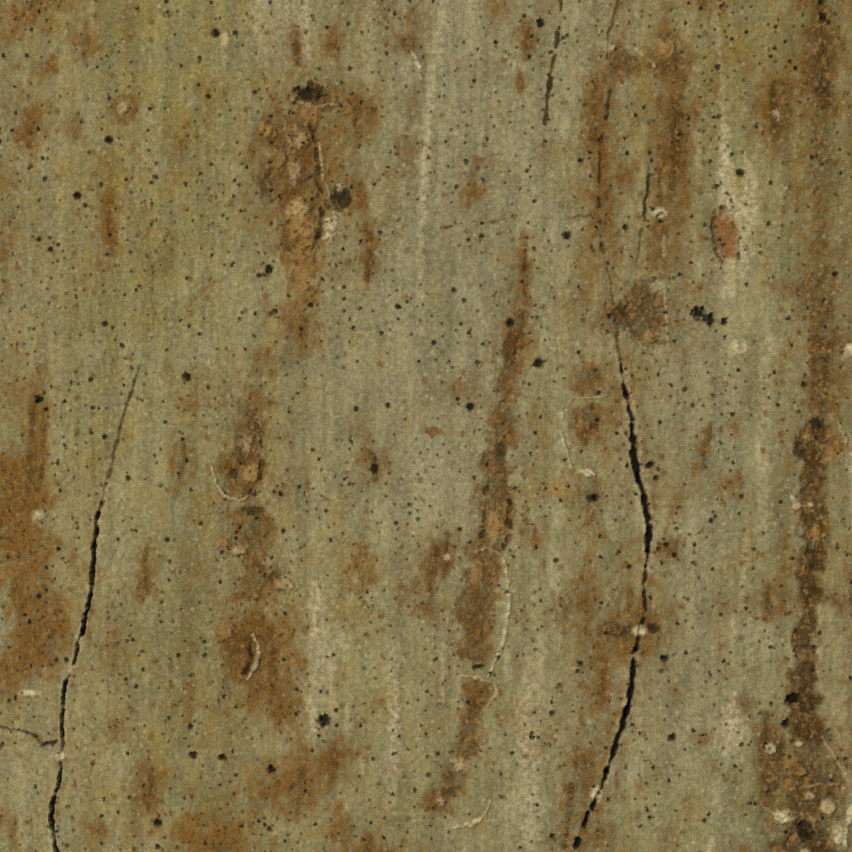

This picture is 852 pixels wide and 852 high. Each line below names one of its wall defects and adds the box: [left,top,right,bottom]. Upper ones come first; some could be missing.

corrosion [0,0,114,307]
peeling [239,59,359,318]
corrosion [282,0,439,315]
crack [439,216,516,231]
crack [541,0,565,133]
crack [605,0,622,62]
corrosion [574,27,708,279]
spalling [709,197,743,268]
corrosion [744,240,852,436]
crack [0,365,141,852]
corrosion [0,335,441,852]
crack [558,89,654,852]